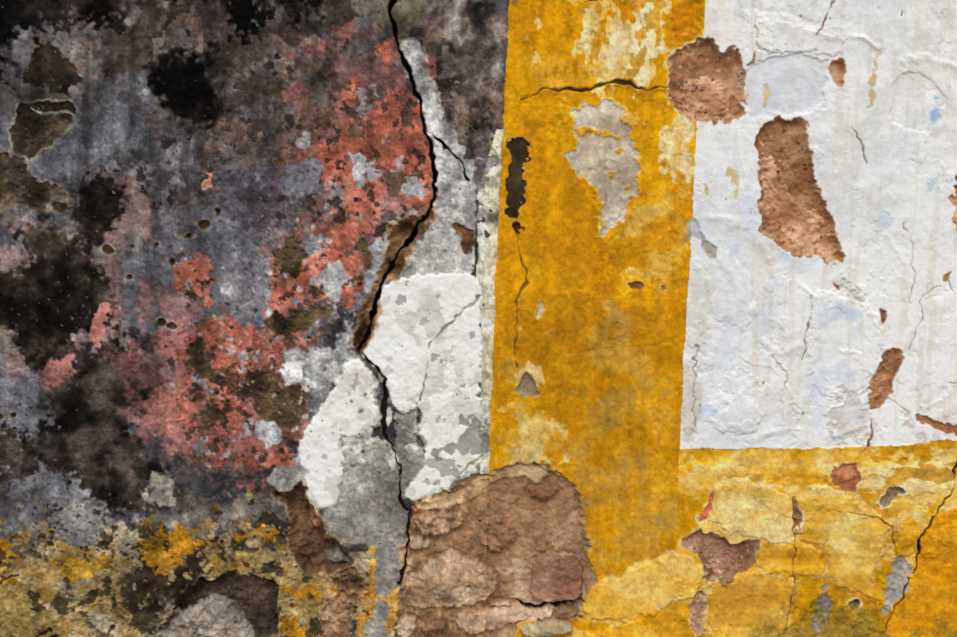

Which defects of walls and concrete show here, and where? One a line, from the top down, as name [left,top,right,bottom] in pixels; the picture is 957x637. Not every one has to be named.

spalling [0,37,81,213]
spalling [505,134,532,235]
crack [521,79,669,101]
peeling [565,99,647,237]
spalling [667,0,847,265]
peeling [157,71,439,637]
crack [352,0,505,588]
crack [902,222,957,351]
damp [111,555,214,636]
flaking render [357,462,598,637]
spalling [681,492,761,636]
crack [832,461,957,632]